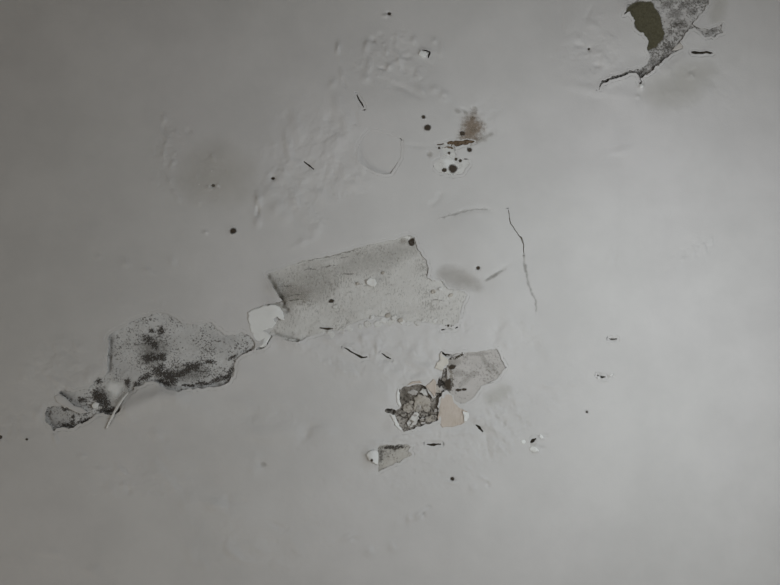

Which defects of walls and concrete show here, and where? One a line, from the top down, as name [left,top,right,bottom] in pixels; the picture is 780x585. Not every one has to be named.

peeling [596,0,725,92]
crack [506,208,527,255]
peeling [40,232,470,434]
flaking render [366,346,508,475]